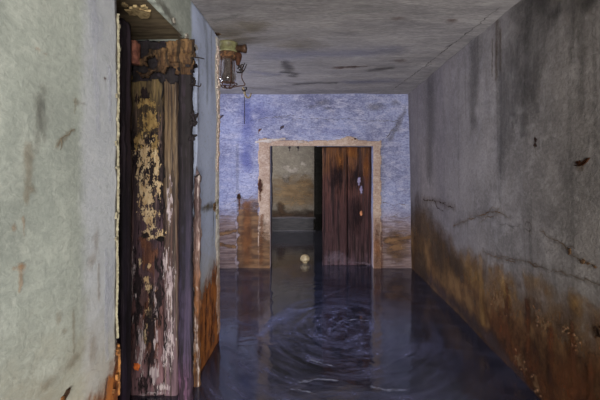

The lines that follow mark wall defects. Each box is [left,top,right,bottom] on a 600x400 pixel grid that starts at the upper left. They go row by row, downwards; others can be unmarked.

spalling [112,2,151,396]
peeling [131,98,173,241]
peeling [131,240,177,396]
rust [200,266,219,370]
leakage [219,200,270,268]
leakage [381,205,462,277]
rust [411,220,600,400]
crack [483,231,597,284]